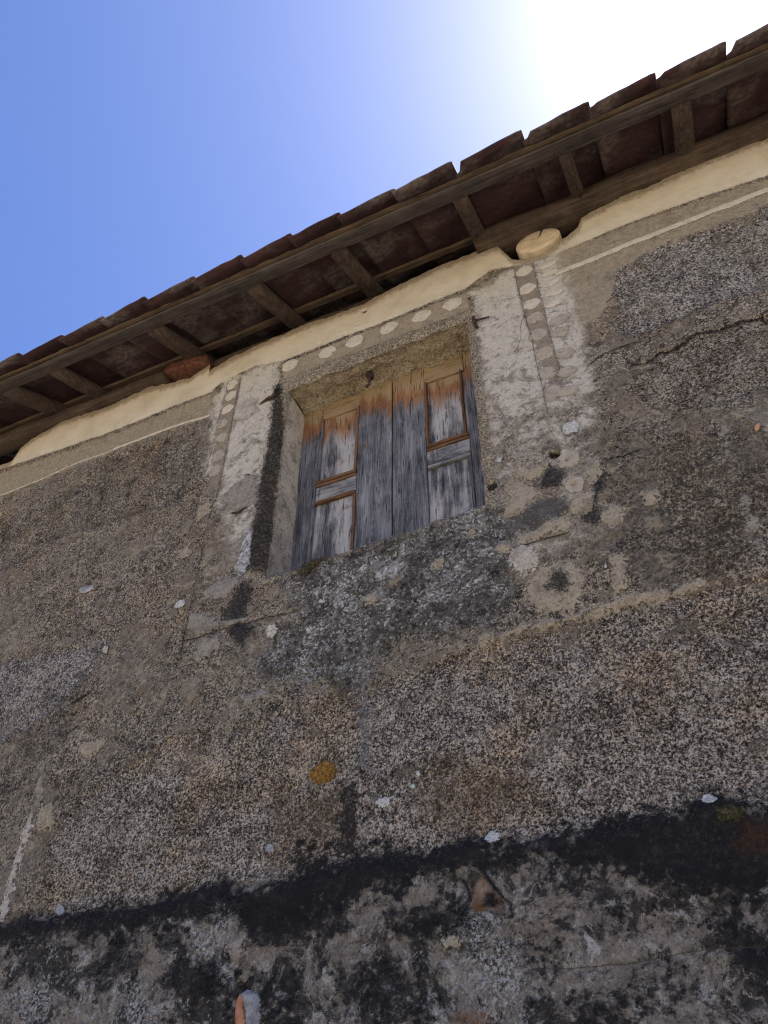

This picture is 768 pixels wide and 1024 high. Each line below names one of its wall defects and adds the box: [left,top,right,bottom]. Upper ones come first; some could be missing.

crack [588,310,768,366]
water stain [221,383,286,649]
flaking render [0,459,768,924]
water stain [0,783,768,1024]